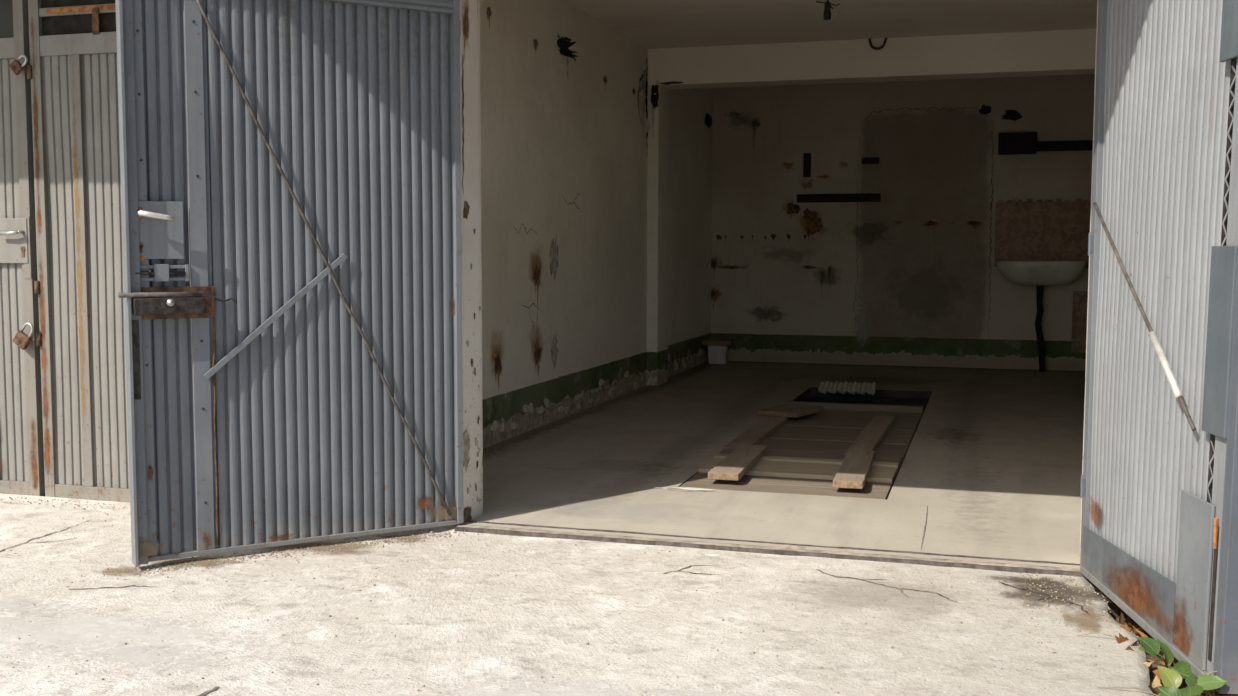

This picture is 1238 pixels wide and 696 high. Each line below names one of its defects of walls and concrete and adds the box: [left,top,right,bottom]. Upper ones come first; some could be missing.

rust [23,85,50,488]
spalling [793,387,933,413]
peeling [463,371,658,472]
spalling [644,472,717,491]
spalling [464,485,477,523]
crack [816,569,957,602]
rust [1115,570,1189,655]